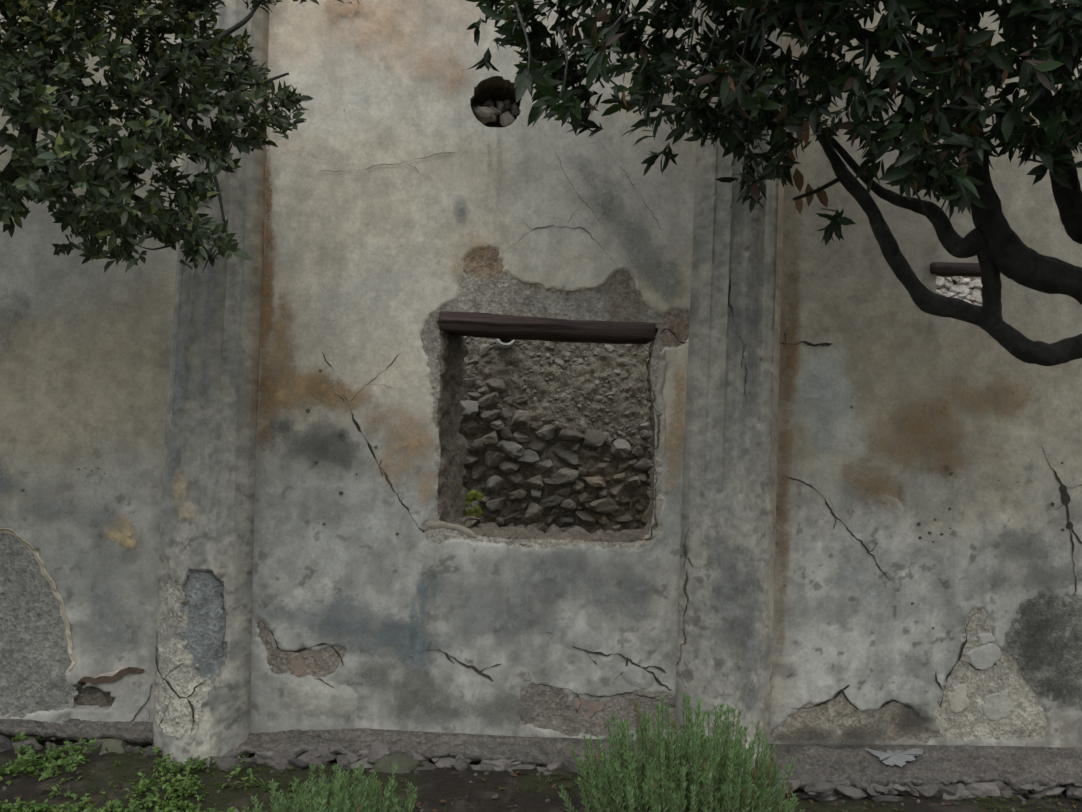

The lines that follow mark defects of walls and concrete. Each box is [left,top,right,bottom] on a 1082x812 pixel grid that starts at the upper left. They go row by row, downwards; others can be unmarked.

crack [314,152,464,180]
crack [322,352,426,533]
flaking render [420,247,690,550]
crack [786,476,890,580]
crack [1043,449,1082,596]
flaking render [0,528,78,718]
flaking render [154,569,227,739]
flaking render [257,620,346,678]
crack [408,641,501,681]
crack [524,527,693,712]
flaking render [771,591,1082,767]